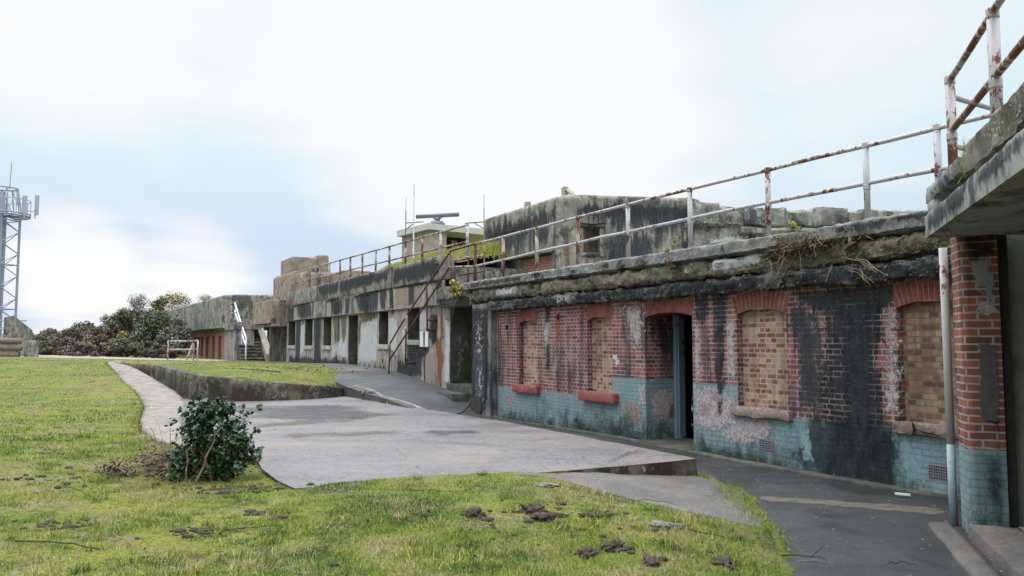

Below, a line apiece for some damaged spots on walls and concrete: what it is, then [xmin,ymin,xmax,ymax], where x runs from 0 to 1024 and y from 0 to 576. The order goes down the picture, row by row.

leakage [485,205,556,255]
leakage [575,200,697,260]
spalling [971,259,1000,319]
leakage [288,259,520,411]
rust [423,307,443,384]
leakage [512,275,766,415]
leakage [787,257,952,485]
peeling [691,383,814,462]